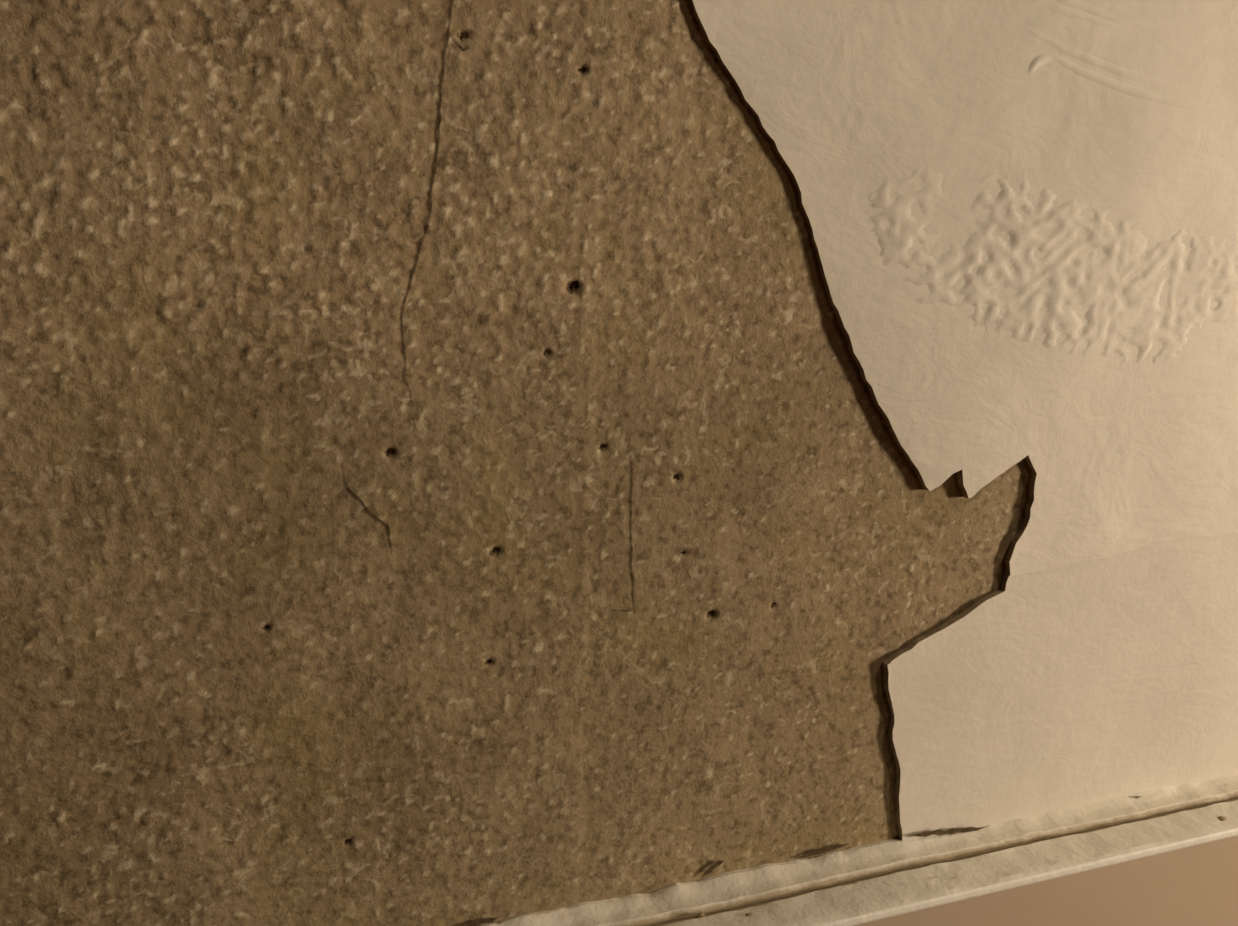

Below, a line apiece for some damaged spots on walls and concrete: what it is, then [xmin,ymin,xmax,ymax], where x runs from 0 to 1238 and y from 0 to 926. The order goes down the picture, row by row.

flaking render [689,0,929,491]
flaking render [883,456,1037,840]
peeling [891,533,1238,841]